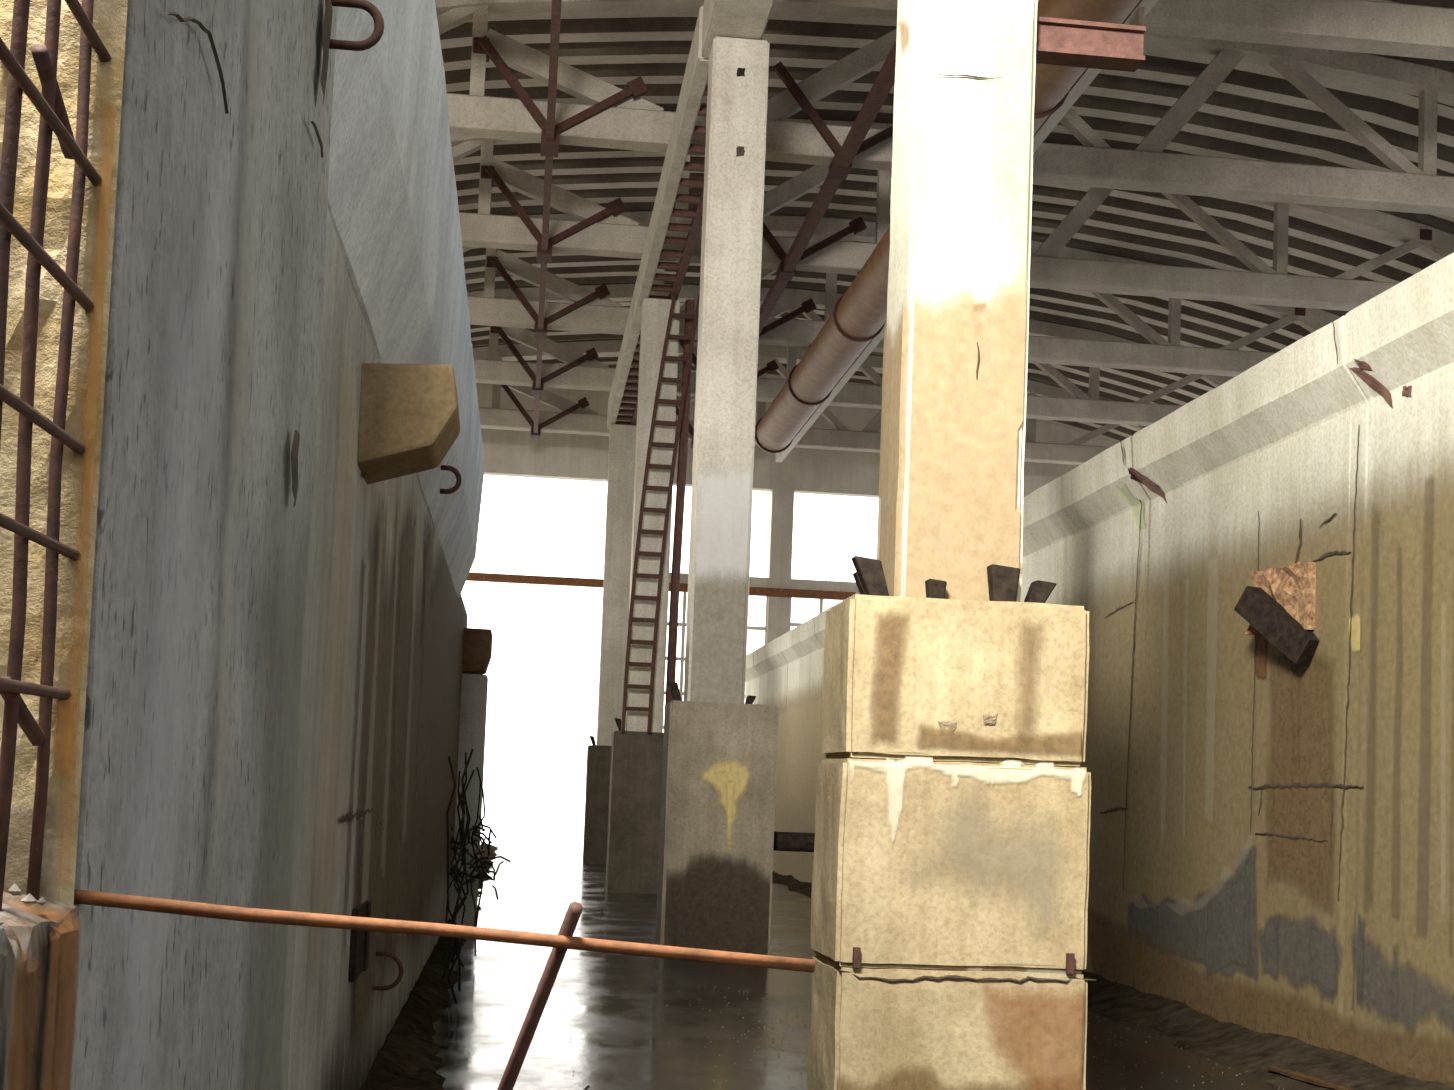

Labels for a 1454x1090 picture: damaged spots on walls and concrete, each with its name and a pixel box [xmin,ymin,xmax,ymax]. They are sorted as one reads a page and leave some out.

crack [167,12,229,114]
leakage [703,762,749,840]
leakage [774,691,827,833]
leakage [849,475,1454,1046]
leakage [664,851,814,955]
crack [838,970,1096,983]
leakage [836,1071,942,1090]